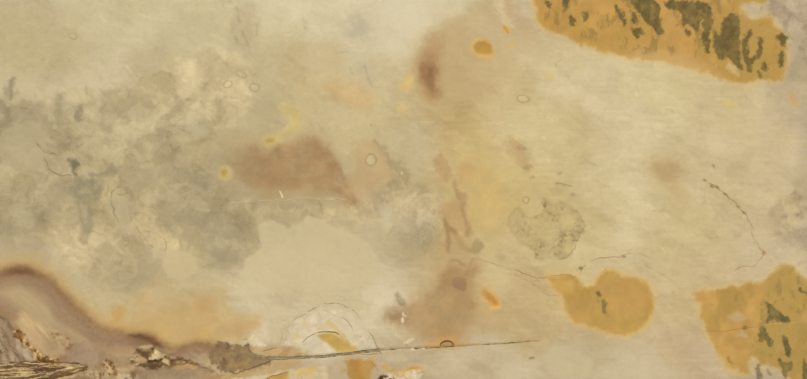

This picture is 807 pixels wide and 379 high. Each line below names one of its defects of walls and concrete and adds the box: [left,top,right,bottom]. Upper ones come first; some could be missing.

water stain [394,28,453,118]
water stain [169,69,413,216]
water stain [36,142,128,236]
crack [703,164,768,281]
crack [474,247,672,298]
flaking render [0,301,379,379]
crack [208,334,540,375]